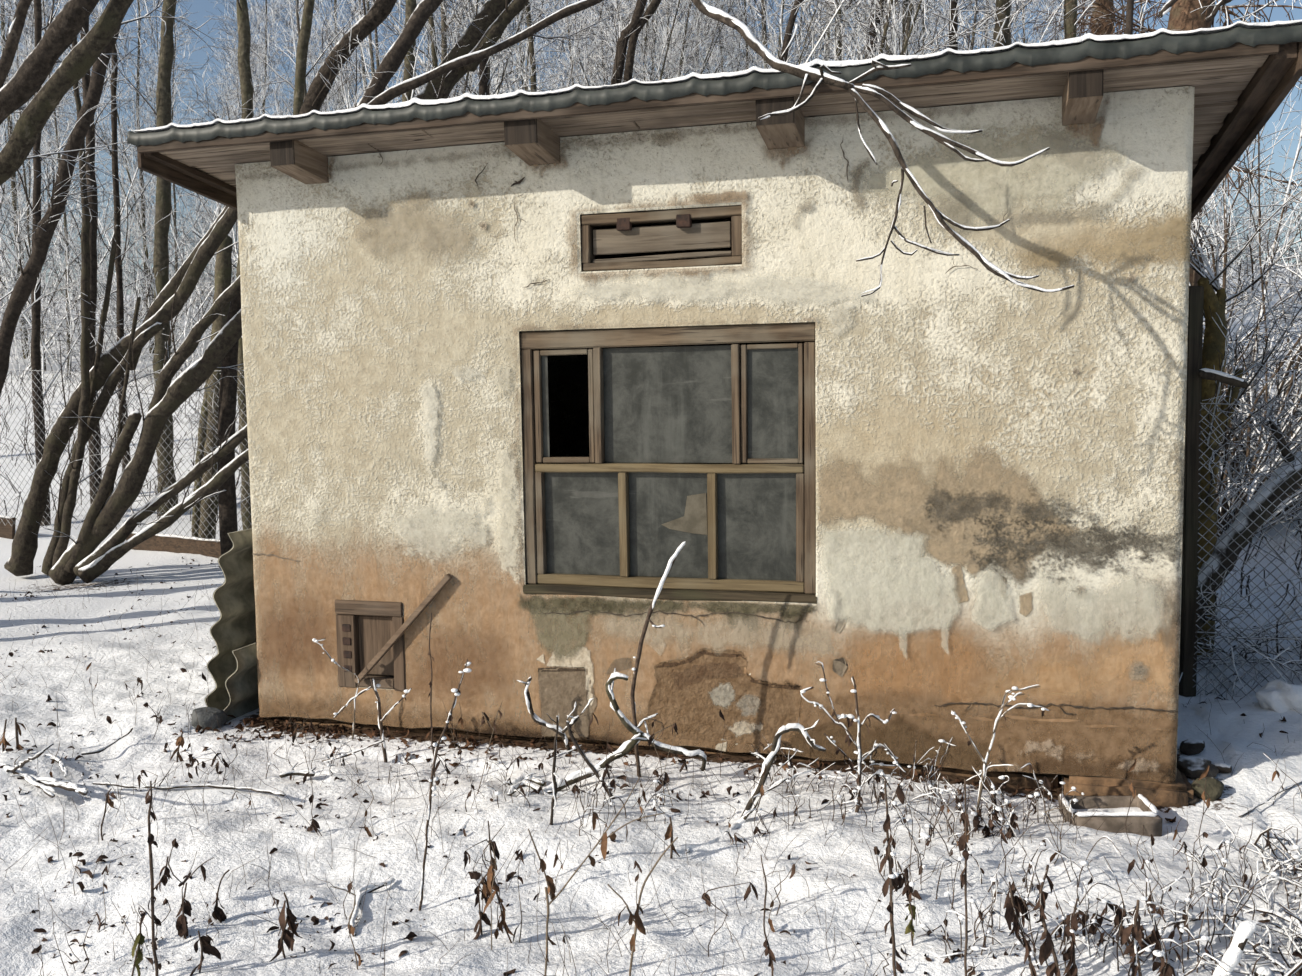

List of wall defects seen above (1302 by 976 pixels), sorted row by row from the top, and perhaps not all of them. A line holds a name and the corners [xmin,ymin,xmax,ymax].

leakage [926,490,1180,583]
peeling [536,647,631,706]
spalling [648,648,801,751]